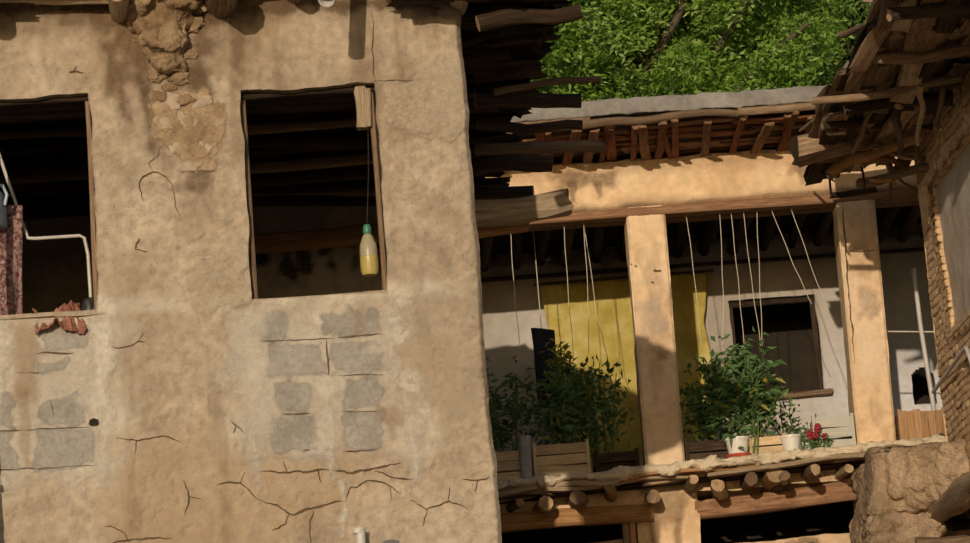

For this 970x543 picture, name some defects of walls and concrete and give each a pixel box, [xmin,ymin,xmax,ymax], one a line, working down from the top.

peeling [186,4,207,34]
spalling [145,70,230,173]
crack [139,146,180,215]
crack [120,435,177,454]
crack [218,448,487,540]
crack [106,526,171,543]